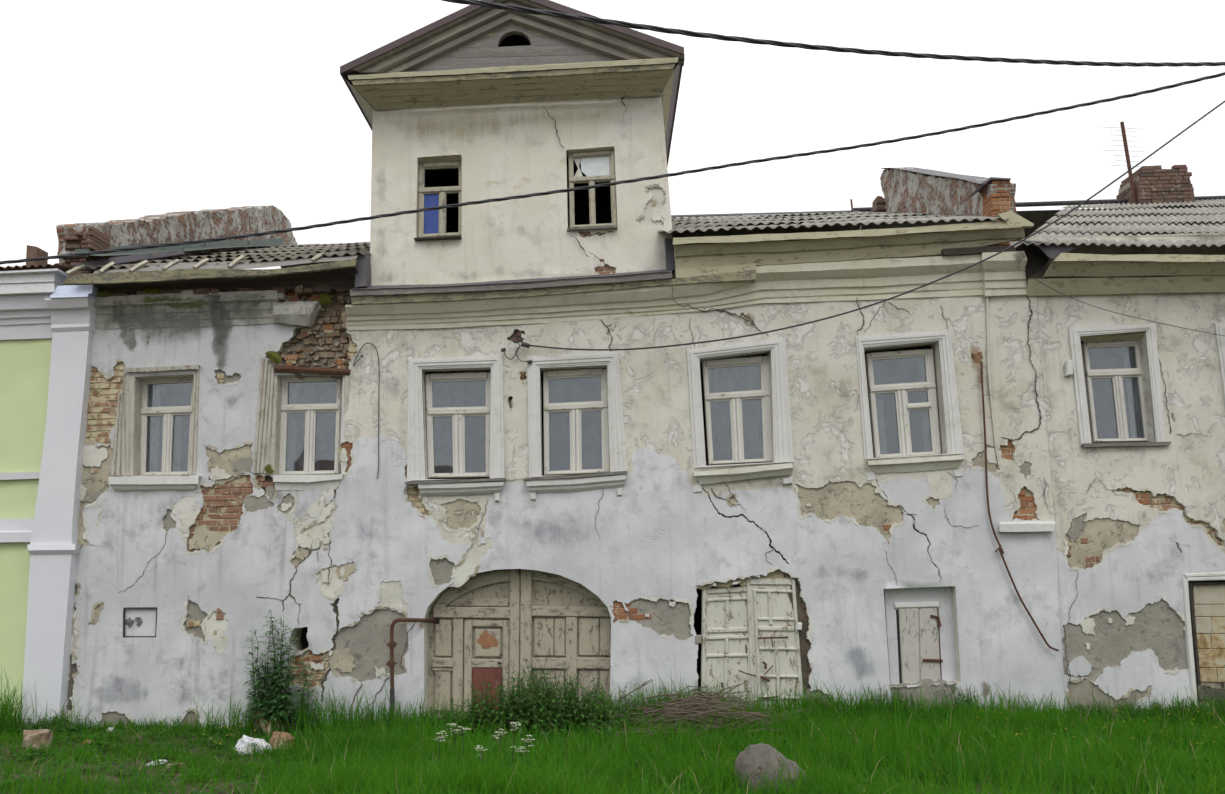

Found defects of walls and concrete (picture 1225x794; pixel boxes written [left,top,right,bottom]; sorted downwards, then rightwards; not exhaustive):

damp [111,294,265,367]
crack [1001,296,1042,441]
flaking render [163,441,298,555]
flaking render [404,466,493,588]
crack [702,482,789,564]
flaking render [792,481,907,544]
flaking render [1062,513,1140,571]
flaking render [1113,486,1225,550]
crack [256,533,415,719]
spalling [281,578,409,691]
spalling [610,566,836,711]
spalling [1062,595,1188,715]